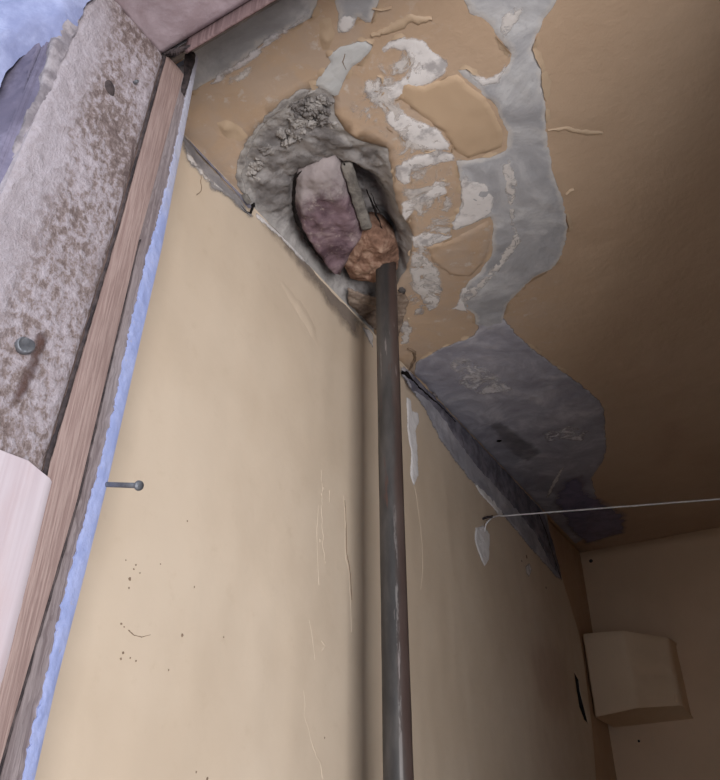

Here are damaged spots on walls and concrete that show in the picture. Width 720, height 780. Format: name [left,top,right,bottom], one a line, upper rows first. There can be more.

peeling [183,0,608,579]
rust [16,334,46,397]
water stain [556,479,625,543]